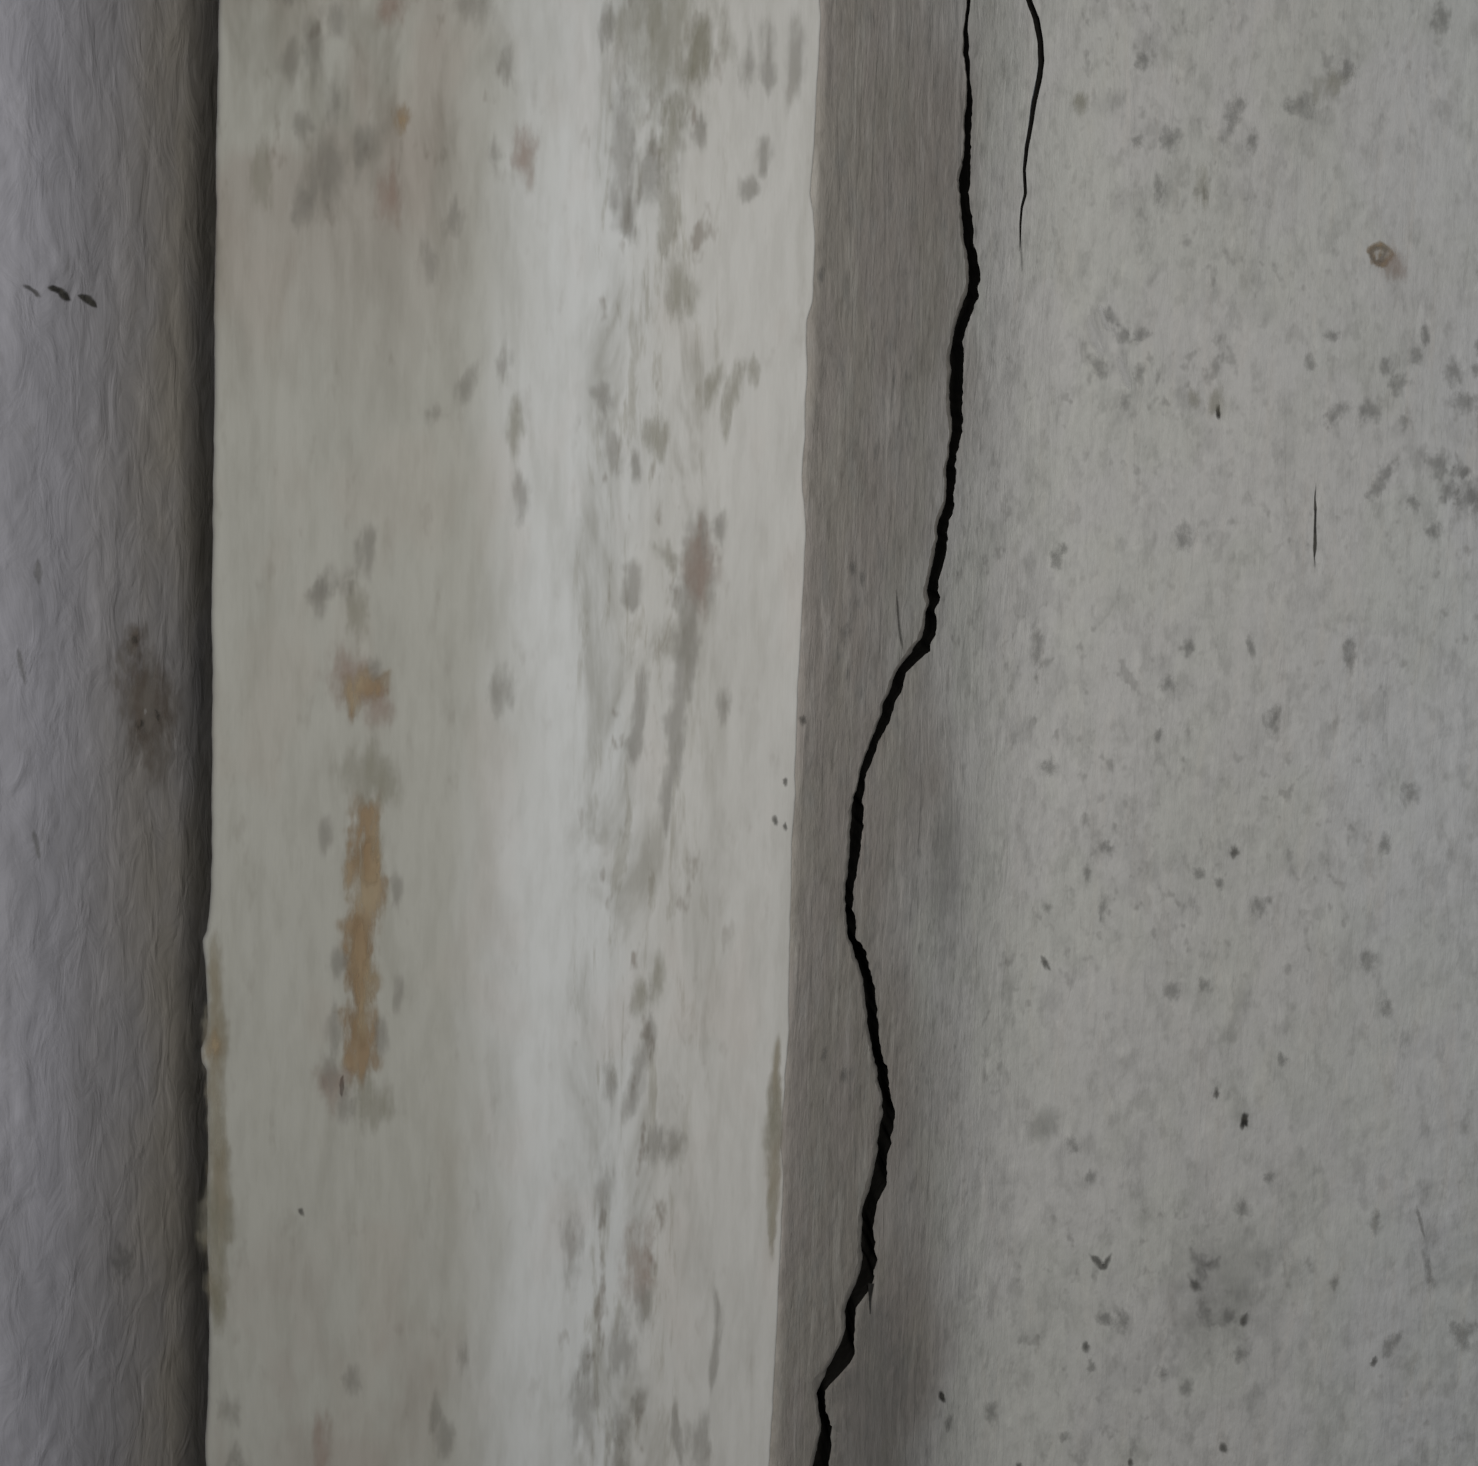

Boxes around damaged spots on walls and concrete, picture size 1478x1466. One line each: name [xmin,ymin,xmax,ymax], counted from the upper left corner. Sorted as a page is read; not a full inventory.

crack [1019,0,1044,247]
crack [809,0,981,1466]
rust [344,804,385,1082]